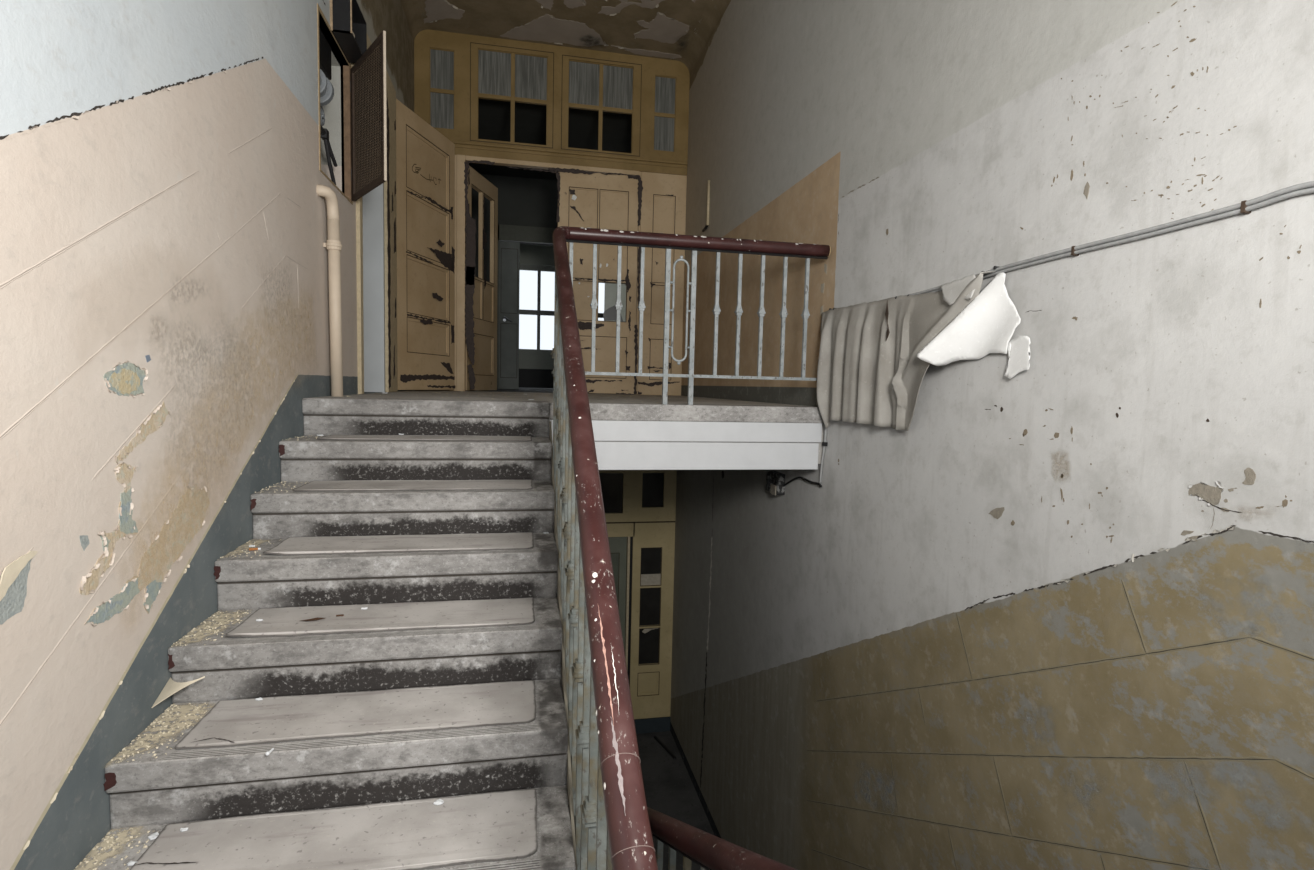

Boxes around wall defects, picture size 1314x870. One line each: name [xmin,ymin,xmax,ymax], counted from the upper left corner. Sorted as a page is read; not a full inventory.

peeling [424,0,465,23]
peeling [500,0,689,59]
peeling [103,360,148,398]
peeling [79,401,230,626]
flaking render [1188,468,1256,512]
peeling [0,551,38,624]